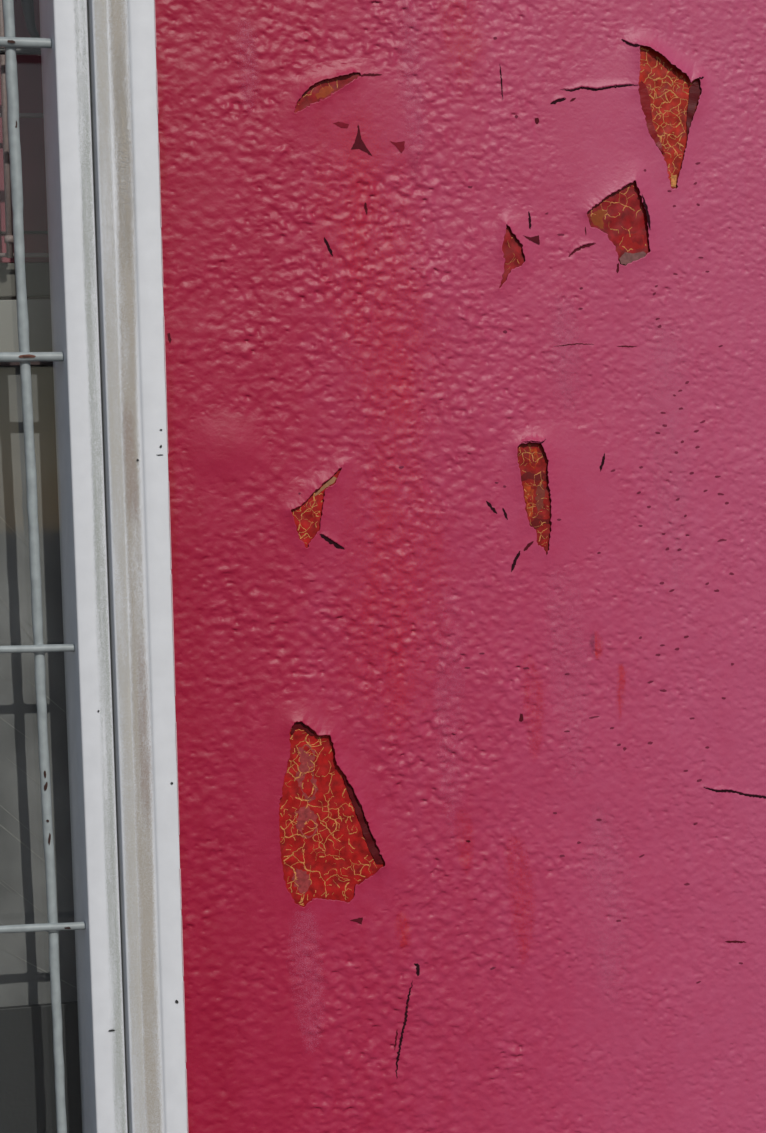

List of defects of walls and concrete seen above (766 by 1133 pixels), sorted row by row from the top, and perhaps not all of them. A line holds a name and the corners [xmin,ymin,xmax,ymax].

peeling [294,72,361,113]
crack [550,84,634,104]
peeling [638,45,701,207]
peeling [499,225,540,288]
peeling [587,169,650,266]
peeling [291,468,342,548]
peeling [517,442,561,555]
peeling [279,722,385,907]
crack [704,787,766,798]
crack [394,963,420,1078]